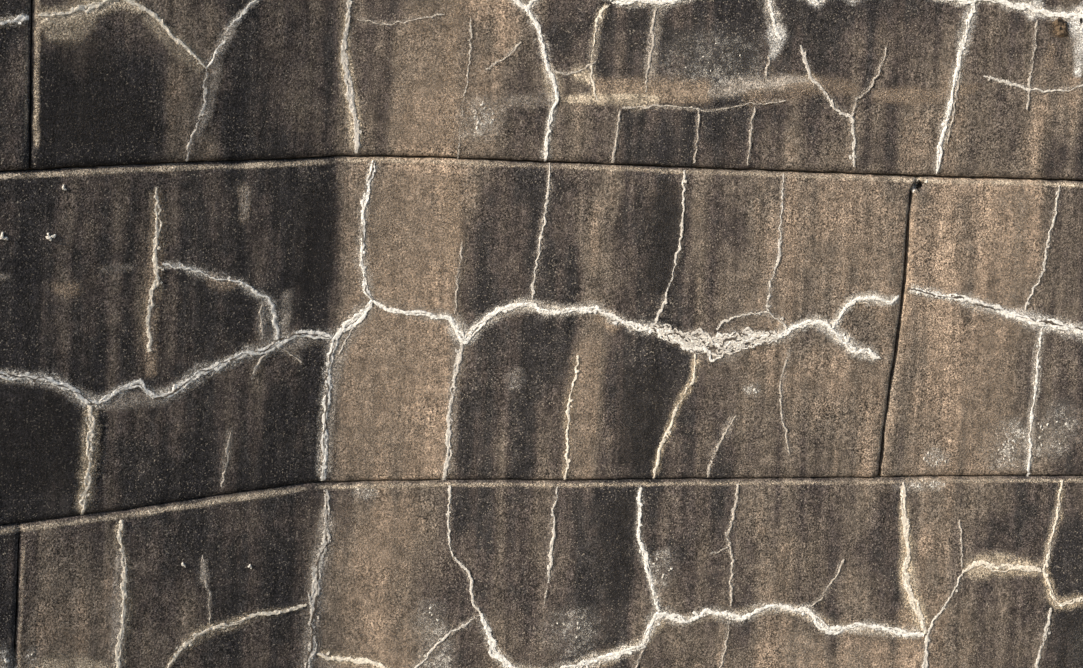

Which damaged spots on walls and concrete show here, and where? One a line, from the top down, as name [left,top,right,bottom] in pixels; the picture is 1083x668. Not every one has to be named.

water stain [240,186,249,219]
water stain [402,36,466,102]
crack [0,0,899,515]
water stain [455,101,494,136]
water stain [565,56,819,106]
crack [907,185,1083,476]
crack [935,0,1083,174]
water stain [991,422,1024,469]
water stain [26,651,107,668]
crack [166,490,390,668]
crack [414,485,516,668]
crack [560,480,1083,668]